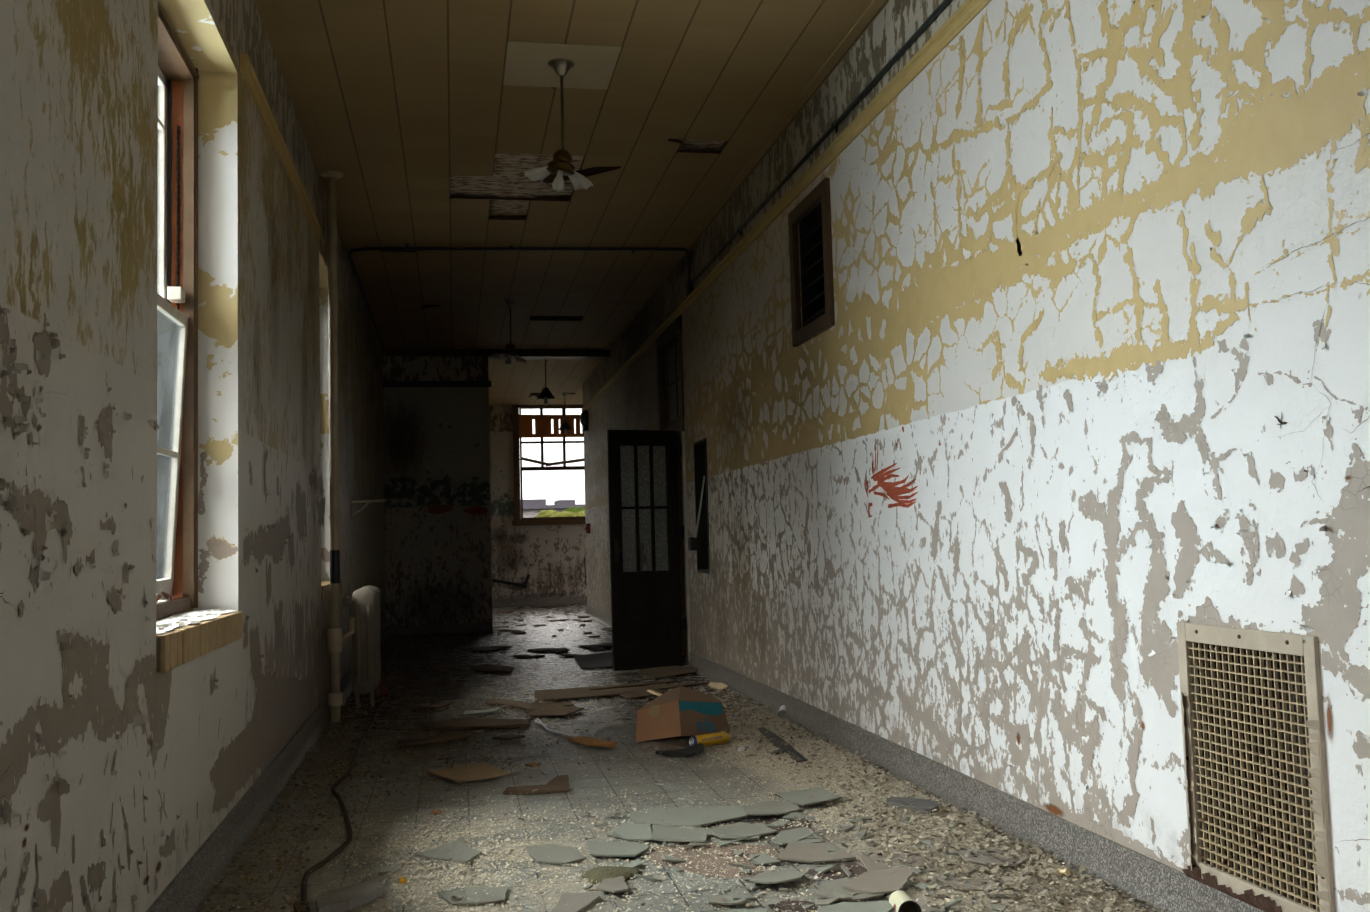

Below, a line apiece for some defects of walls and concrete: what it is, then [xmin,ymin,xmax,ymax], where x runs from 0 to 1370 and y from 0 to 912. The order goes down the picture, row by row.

peeling [0,305,187,912]
peeling [196,449,325,819]
peeling [631,695,1166,912]
peeling [857,0,1370,873]
crack [1262,217,1370,269]
crack [1265,282,1370,500]